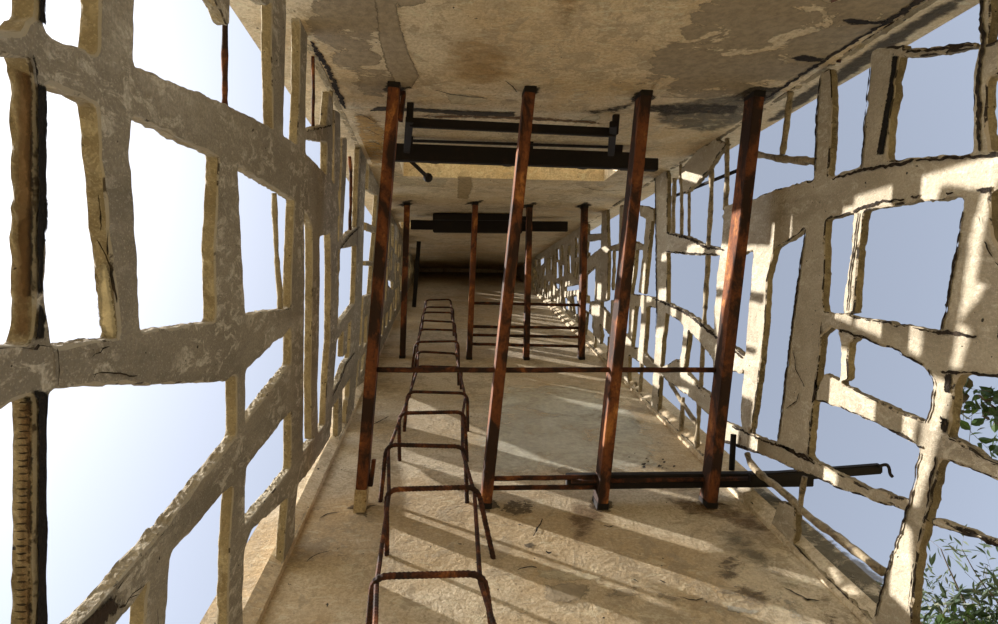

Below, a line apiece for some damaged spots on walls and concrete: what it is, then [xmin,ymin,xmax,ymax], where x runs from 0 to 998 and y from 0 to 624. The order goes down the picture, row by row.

peeling [634,0,914,166]
corrosion [354,115,384,164]
crack [93,346,137,380]
spalling [24,390,49,624]
spalling [83,595,121,624]